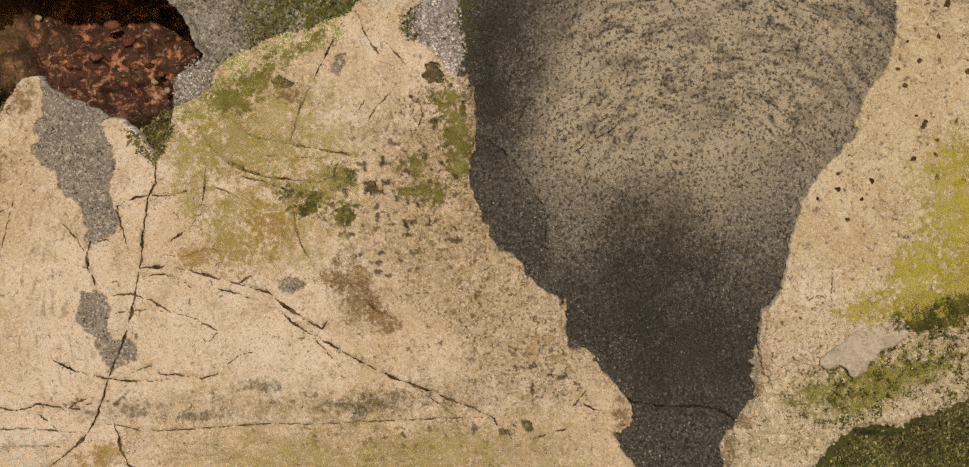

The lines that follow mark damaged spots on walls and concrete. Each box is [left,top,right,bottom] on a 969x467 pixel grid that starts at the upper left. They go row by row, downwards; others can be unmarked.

spalling [0,0,203,244]
water stain [181,189,306,266]
crack [0,16,497,467]
water stain [173,88,346,207]
crack [489,141,550,254]
spalling [76,291,137,373]
water stain [893,311,969,333]
crack [628,398,735,421]
spalling [719,316,969,467]